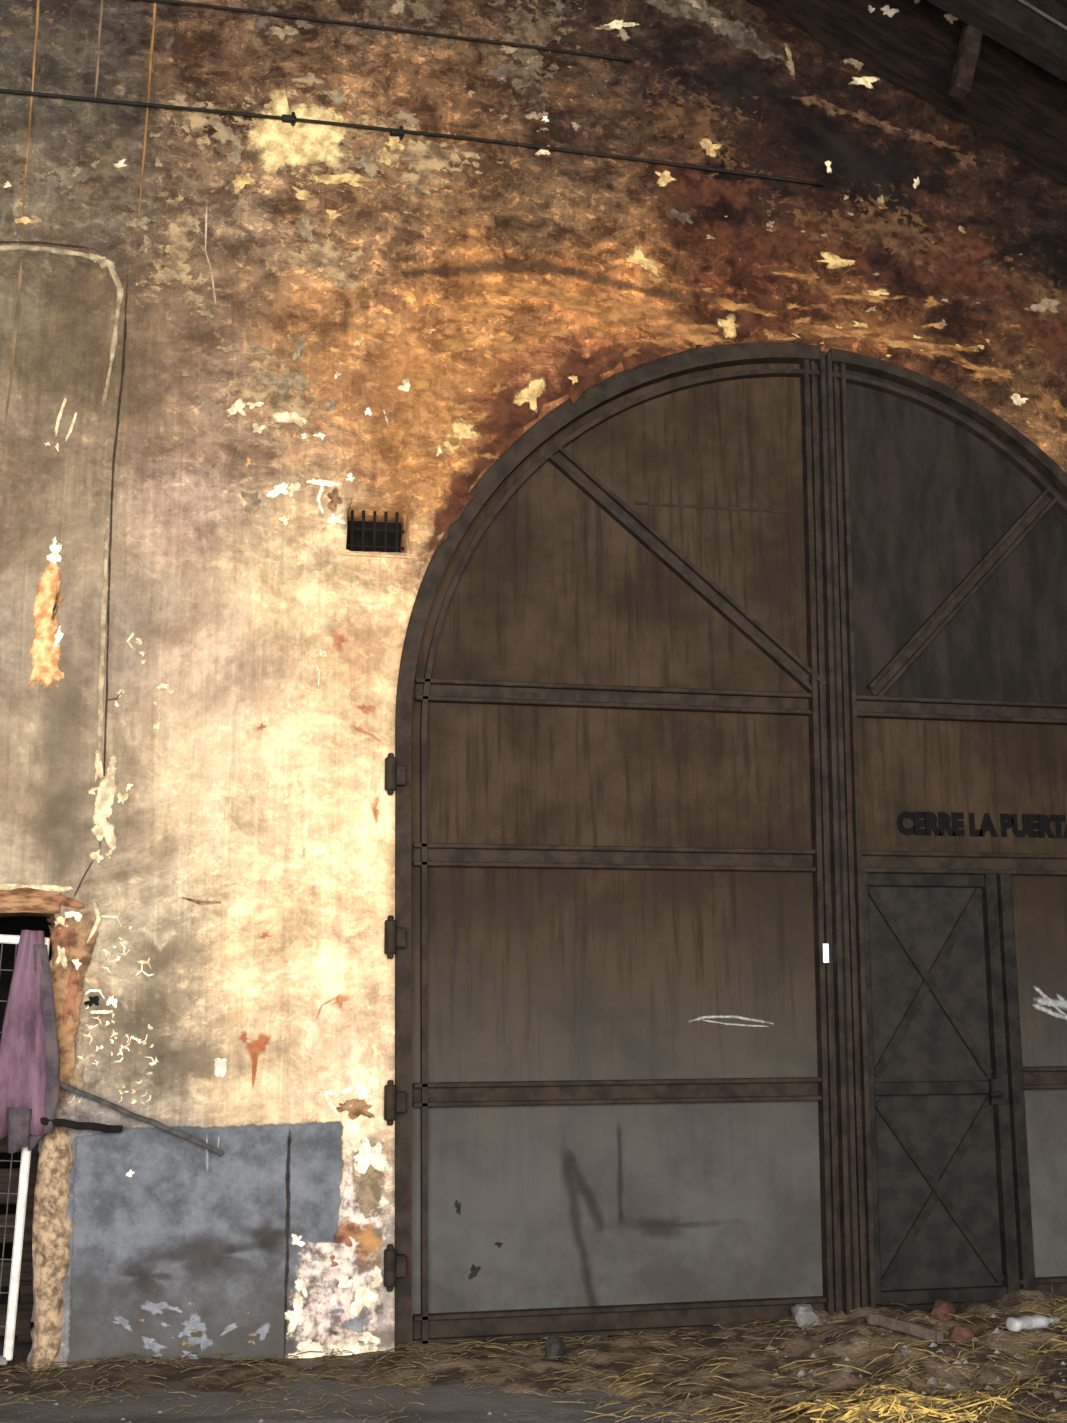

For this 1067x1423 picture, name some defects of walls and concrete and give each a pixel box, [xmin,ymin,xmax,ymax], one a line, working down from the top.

corrosion [20,0,40,241]
corrosion [95,0,103,94]
corrosion [139,2,156,213]
peeling [149,0,639,347]
peeling [421,63,1067,412]
spalling [844,58,880,88]
leakage [795,108,941,227]
peeling [181,324,344,466]
spalling [241,473,355,524]
spalling [28,537,64,687]
spalling [285,1072,392,1359]
peeling [114,1299,270,1359]